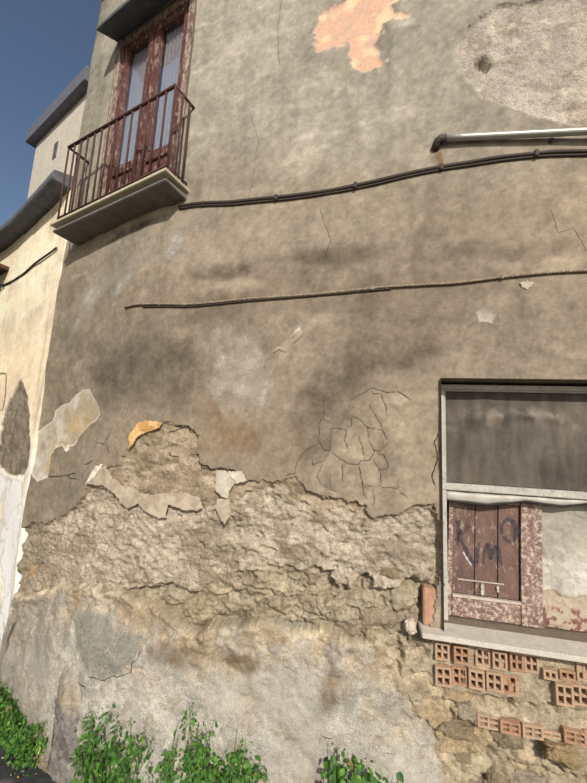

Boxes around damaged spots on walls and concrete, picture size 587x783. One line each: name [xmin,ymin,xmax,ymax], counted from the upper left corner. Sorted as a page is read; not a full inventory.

peeling [456,0,587,127]
crack [286,375,416,503]
crack [430,433,438,485]
spalling [0,379,587,783]
crack [78,650,142,689]